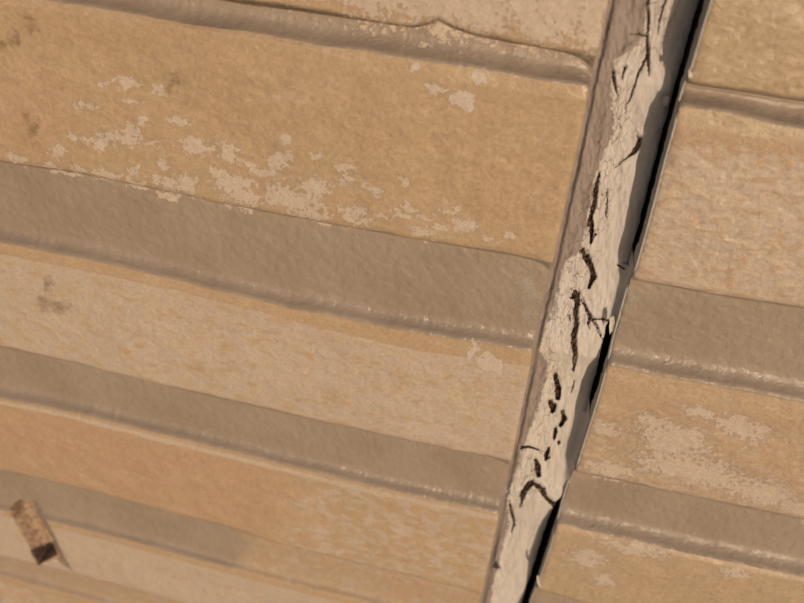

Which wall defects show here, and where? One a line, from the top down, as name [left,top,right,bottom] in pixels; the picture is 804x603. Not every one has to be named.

peeling [272,0,608,77]
crack [612,0,666,108]
peeling [5,74,518,243]
crack [587,135,640,224]
crack [569,290,609,389]
crack [509,481,554,534]